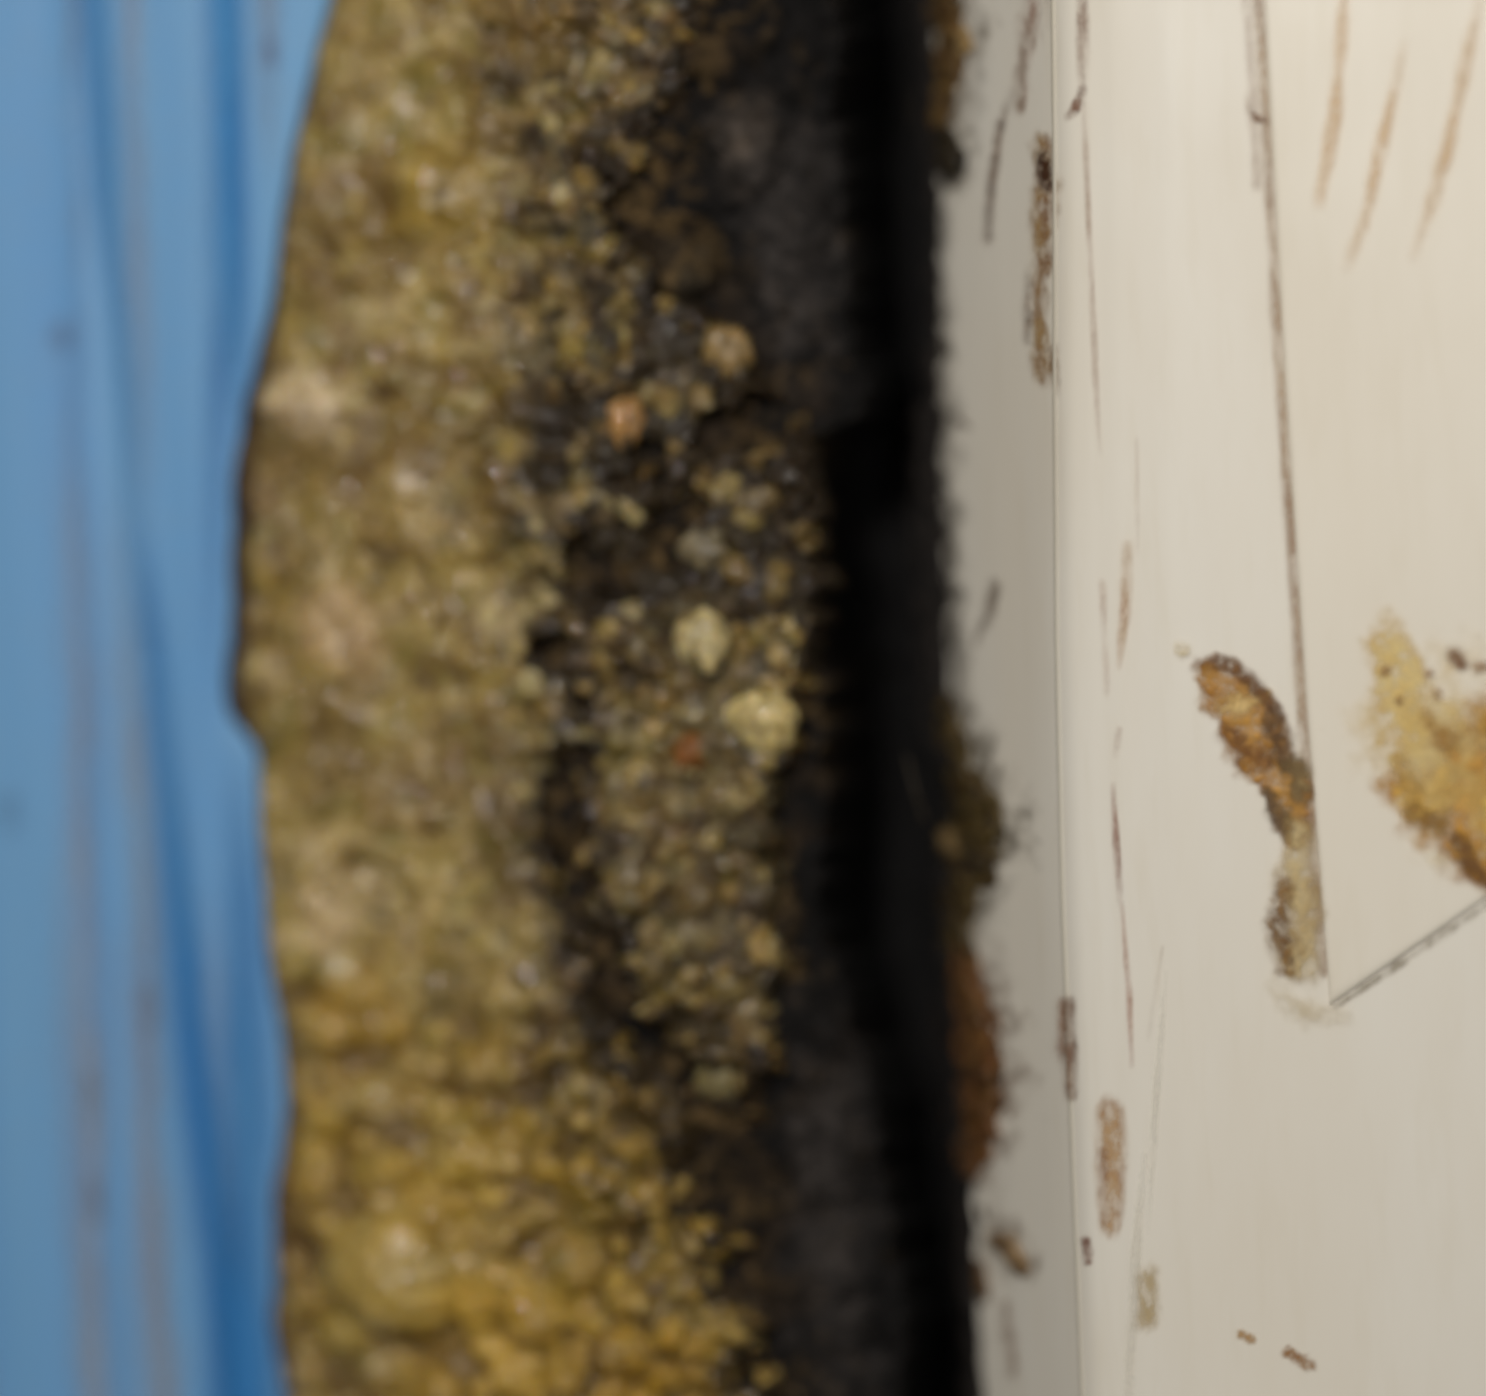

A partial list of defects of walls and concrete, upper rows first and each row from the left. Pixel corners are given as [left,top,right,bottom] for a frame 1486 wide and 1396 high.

water stain [905,0,1005,1396]
rust [1197,656,1318,978]